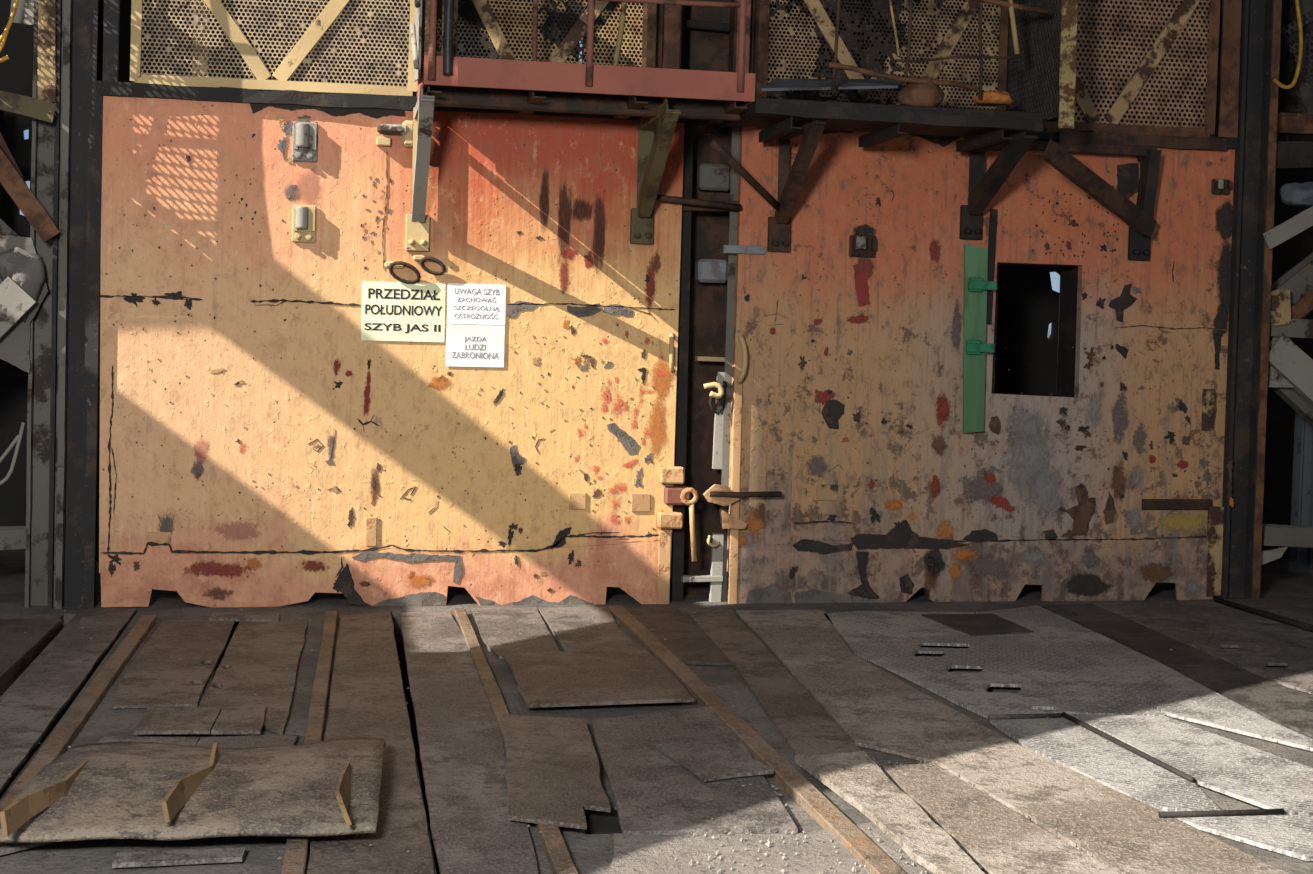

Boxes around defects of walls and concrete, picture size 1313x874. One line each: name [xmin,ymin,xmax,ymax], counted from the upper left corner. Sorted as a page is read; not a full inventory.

rust [854,224,876,236]
rust [847,257,874,323]
peeling [1082,284,1142,322]
peeling [478,304,664,524]
peeling [798,319,913,447]
peeling [1146,397,1212,497]
peeling [1042,451,1142,540]
peeling [332,552,462,606]
peeling [498,523,523,567]
peeling [476,571,593,606]
peeling [552,527,581,568]
peeling [746,507,998,604]